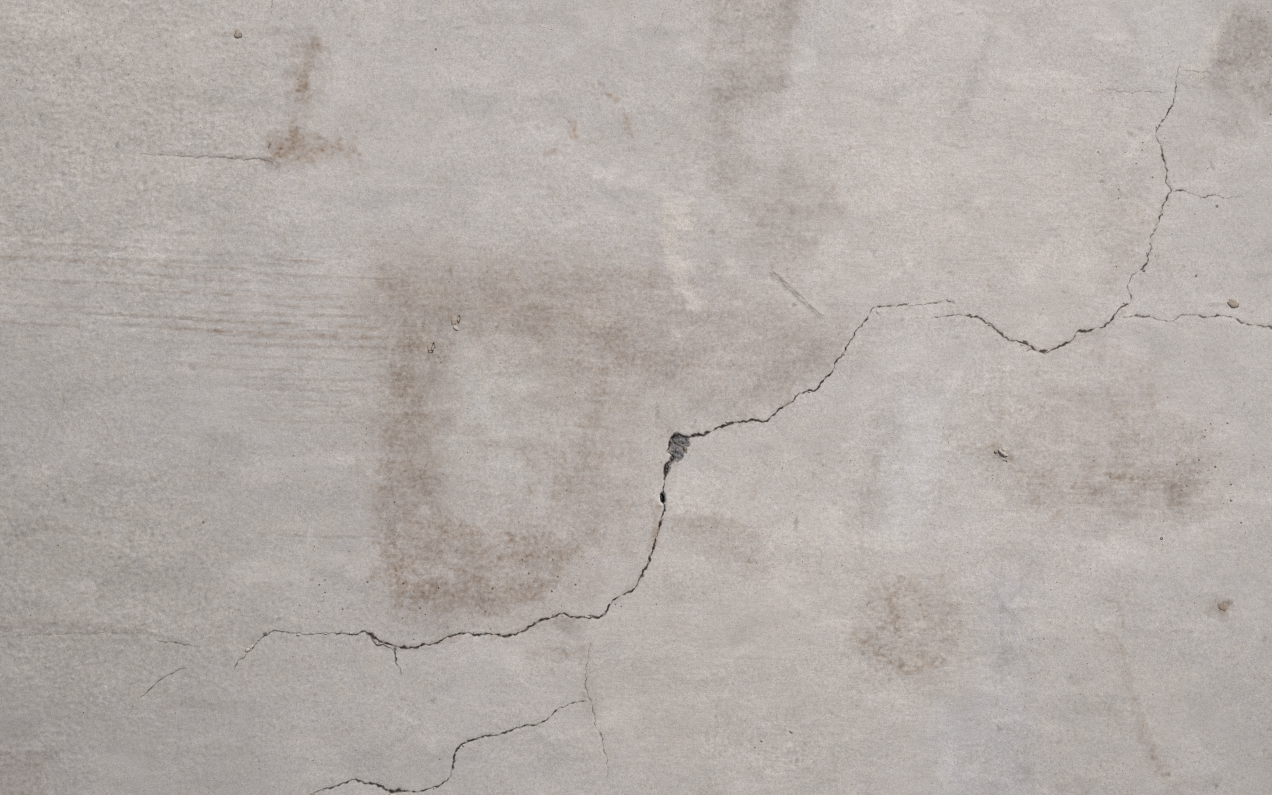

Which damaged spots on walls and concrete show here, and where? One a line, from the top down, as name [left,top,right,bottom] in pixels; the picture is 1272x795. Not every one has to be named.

damp [332,0,888,717]
crack [235,85,1272,667]
crack [312,665,605,795]